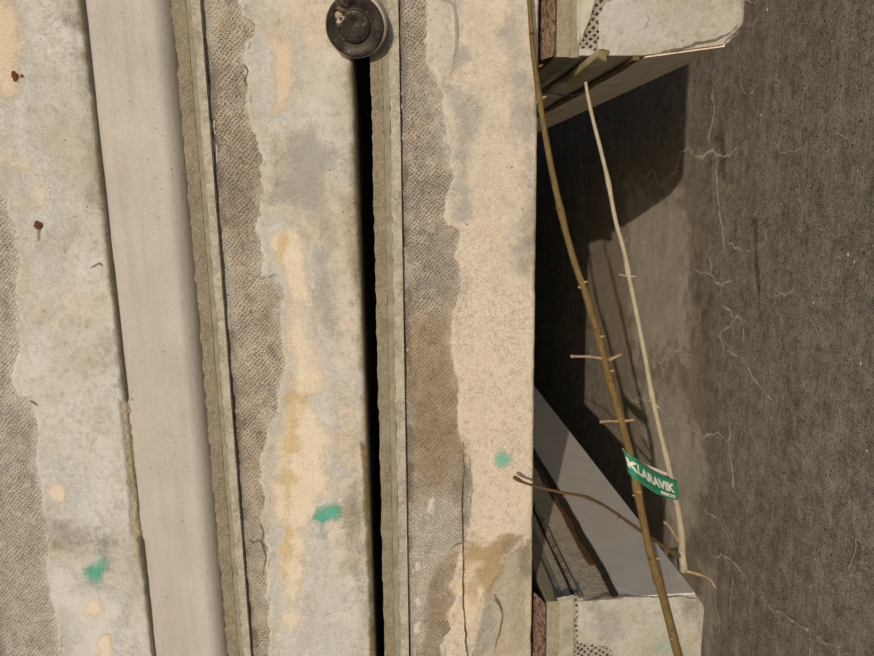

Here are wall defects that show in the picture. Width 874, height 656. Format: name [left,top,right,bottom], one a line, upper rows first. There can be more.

peeling [578,0,610,51]
crack [661,0,765,94]
peeling [0,196,63,656]
peeling [202,0,285,656]
leakage [265,214,346,656]
peeling [398,0,472,656]
crack [451,446,473,656]
crack [494,595,503,650]
peeling [533,499,613,656]
crack [622,89,772,400]
crack [586,348,849,655]